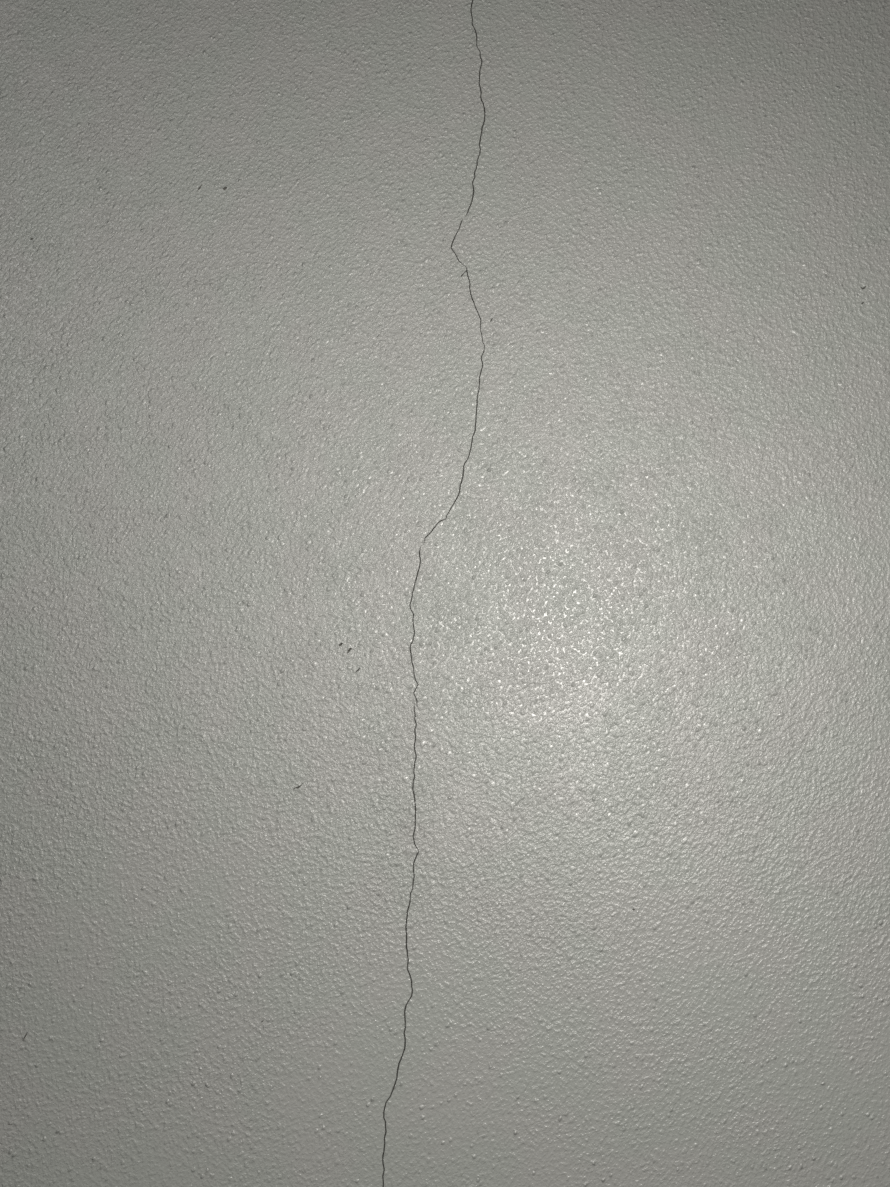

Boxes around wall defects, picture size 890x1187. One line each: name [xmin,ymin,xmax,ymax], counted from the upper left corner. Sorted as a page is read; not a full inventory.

crack [382,0,485,1187]